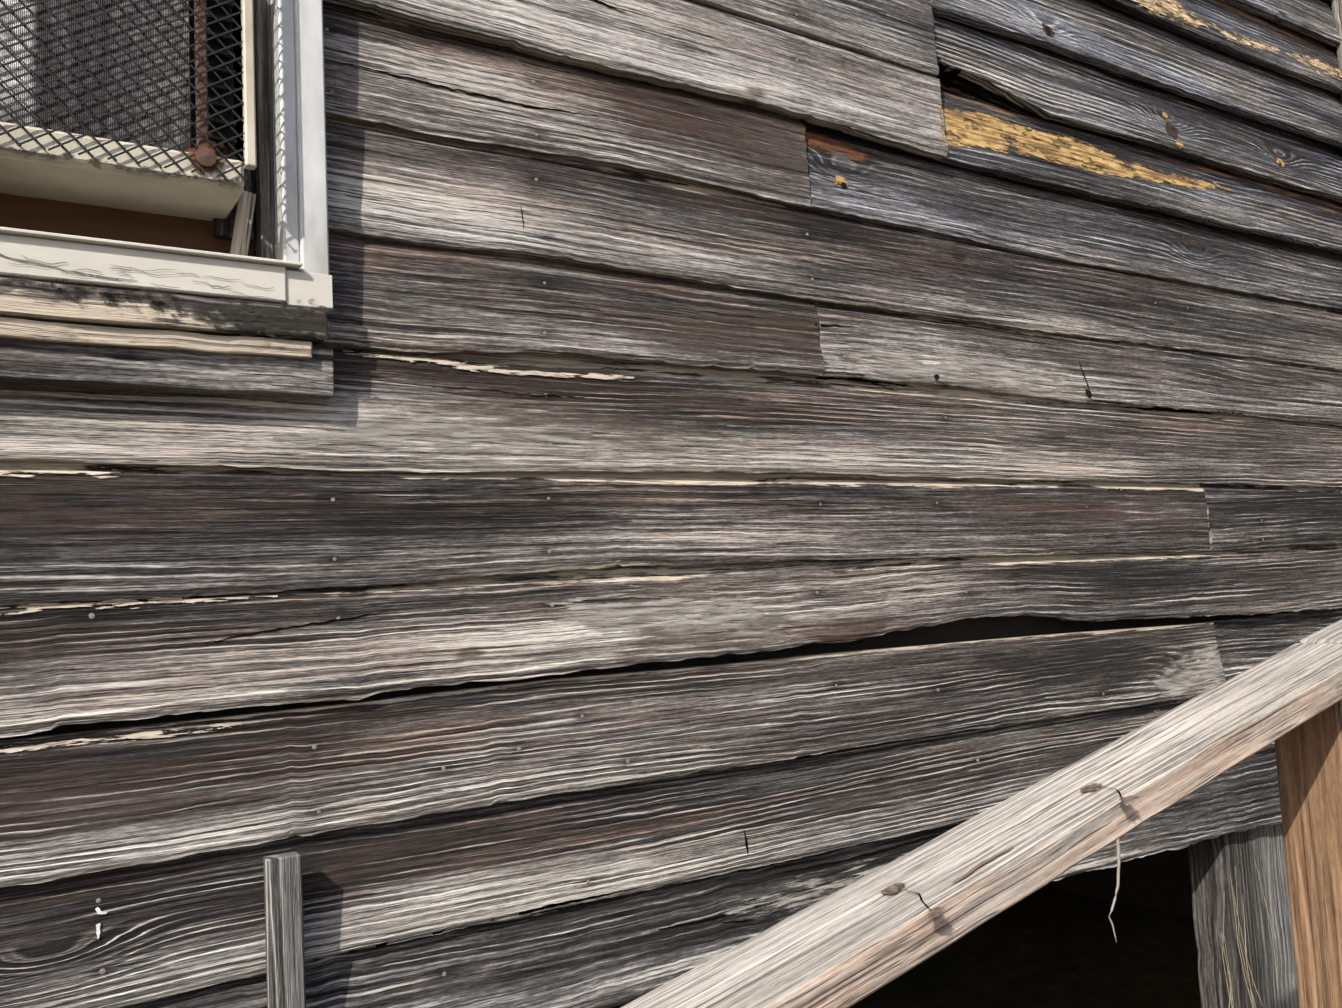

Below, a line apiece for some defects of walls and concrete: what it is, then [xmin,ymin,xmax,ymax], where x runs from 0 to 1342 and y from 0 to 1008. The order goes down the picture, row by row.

corrosion [186,141,225,178]
crack [204,611,389,643]